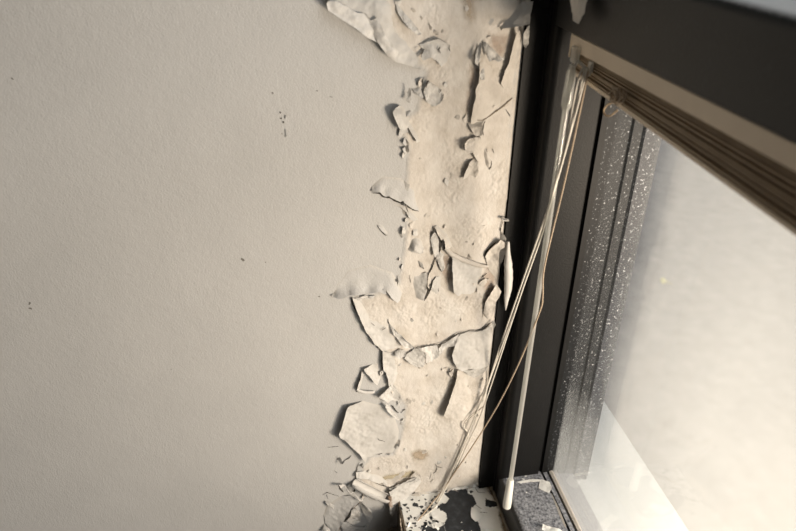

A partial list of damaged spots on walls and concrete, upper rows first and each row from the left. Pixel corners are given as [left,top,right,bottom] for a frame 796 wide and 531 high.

spalling [322,0,533,531]
peeling [570,0,587,24]